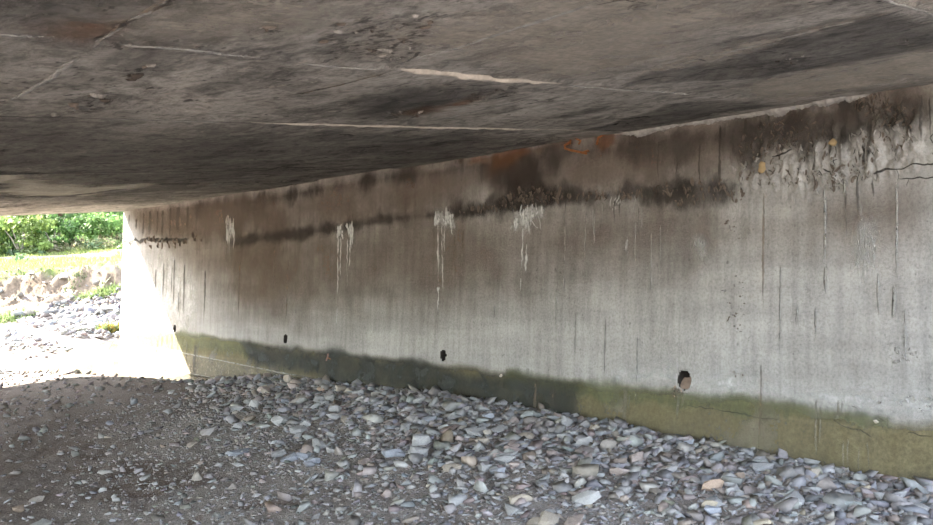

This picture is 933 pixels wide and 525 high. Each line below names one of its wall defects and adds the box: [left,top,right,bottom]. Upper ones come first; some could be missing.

crack [96,19,137,38]
leakage [403,0,820,75]
leakage [749,17,933,97]
crack [873,134,933,183]
crack [122,237,187,249]
leakage [0,92,933,480]